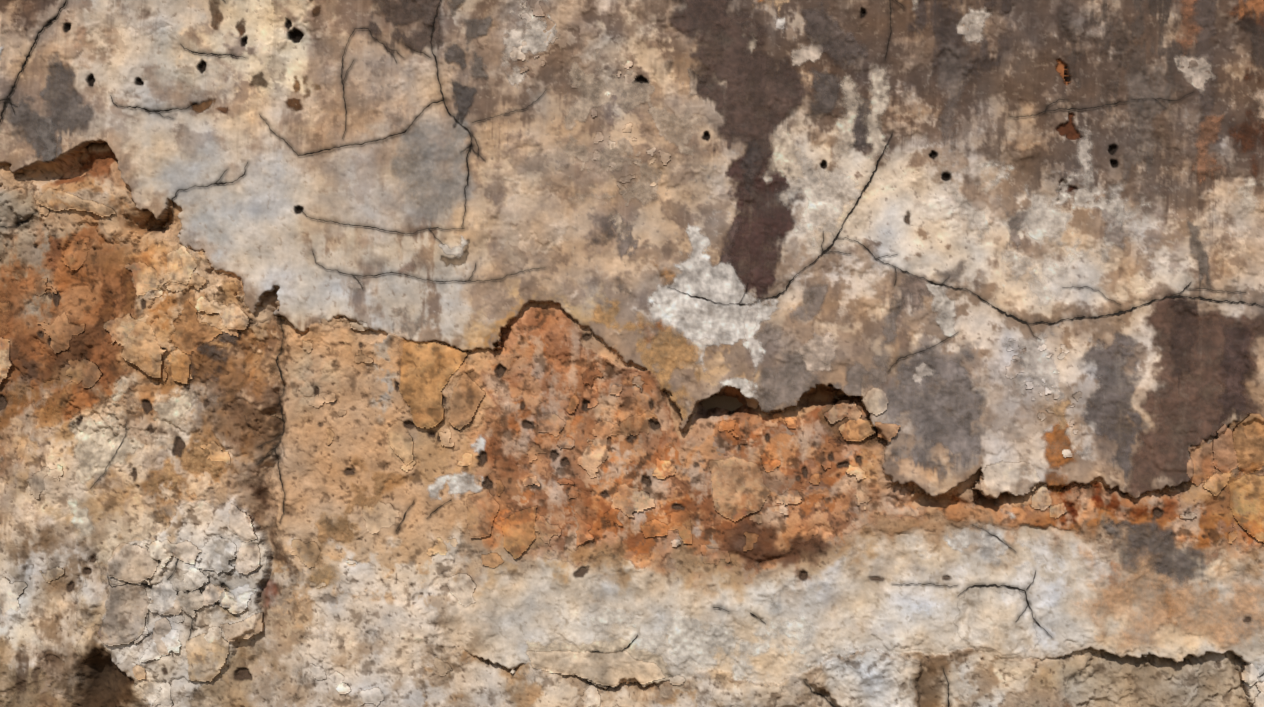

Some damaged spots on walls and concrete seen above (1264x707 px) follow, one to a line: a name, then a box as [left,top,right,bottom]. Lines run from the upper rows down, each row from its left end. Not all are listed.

crack [0,0,67,122]
water stain [8,56,93,162]
crack [110,95,196,119]
crack [259,0,546,245]
corrosion [1193,91,1264,183]
corrosion [1229,0,1264,80]
crack [312,251,539,289]
water stain [649,0,989,478]
crack [668,132,1263,340]
spalling [0,154,1264,707]
corrosion [593,302,700,418]
water stain [1082,293,1264,497]